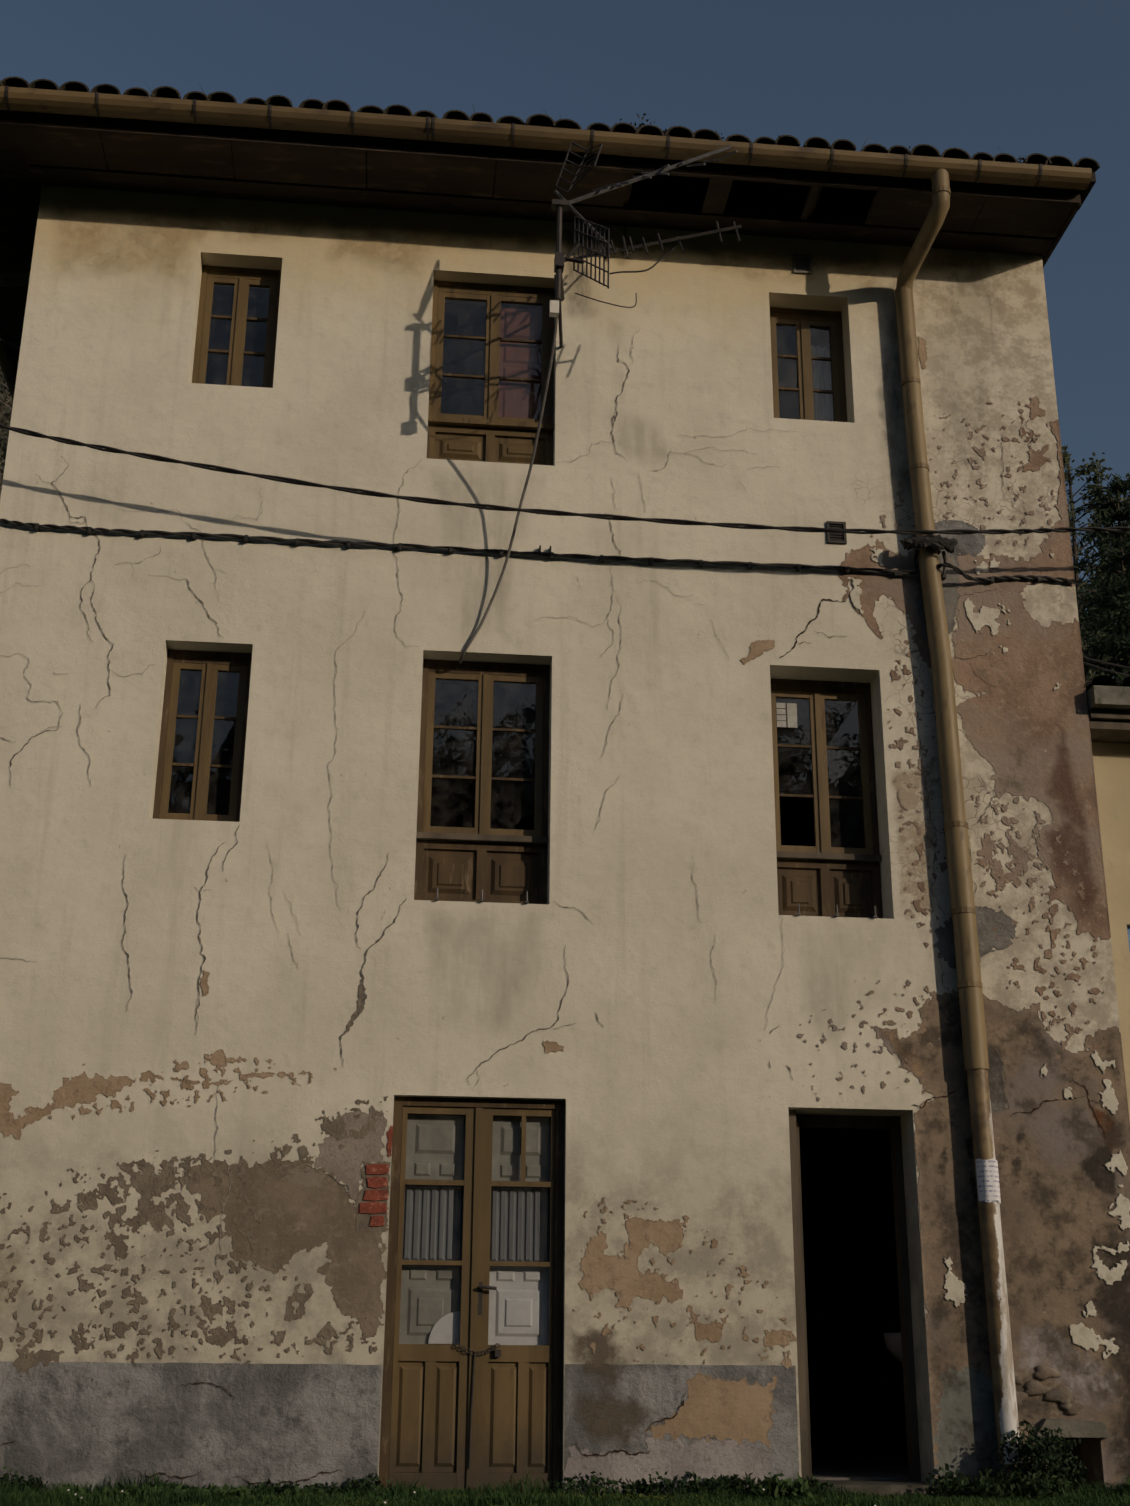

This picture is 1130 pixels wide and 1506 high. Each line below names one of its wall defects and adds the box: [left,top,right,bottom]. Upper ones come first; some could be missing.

crack [0,456,263,785]
crack [327,460,421,1061]
crack [538,328,797,827]
crack [781,599,847,657]
flaking render [838,461,947,948]
crack [122,854,133,1006]
crack [195,825,301,1035]
crack [468,950,604,1085]
flaking render [927,391,1130,1494]
flaking render [0,1096,393,1373]
flaking render [563,1197,797,1495]
flaking render [798,980,992,1481]